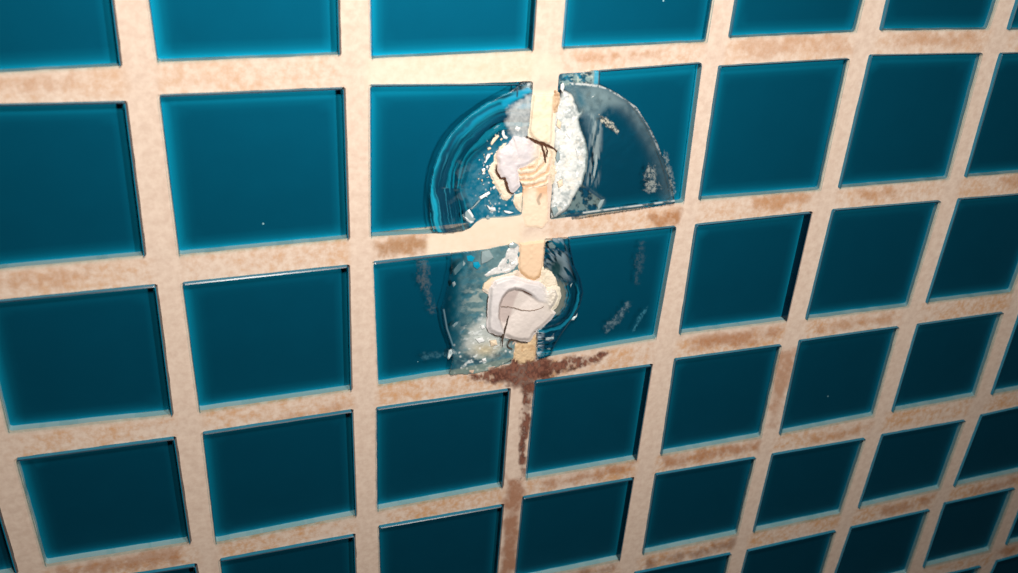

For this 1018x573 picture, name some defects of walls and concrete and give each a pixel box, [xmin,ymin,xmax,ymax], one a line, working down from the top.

crack [486,290,544,350]
rust [471,352,608,469]
rust [503,481,522,573]